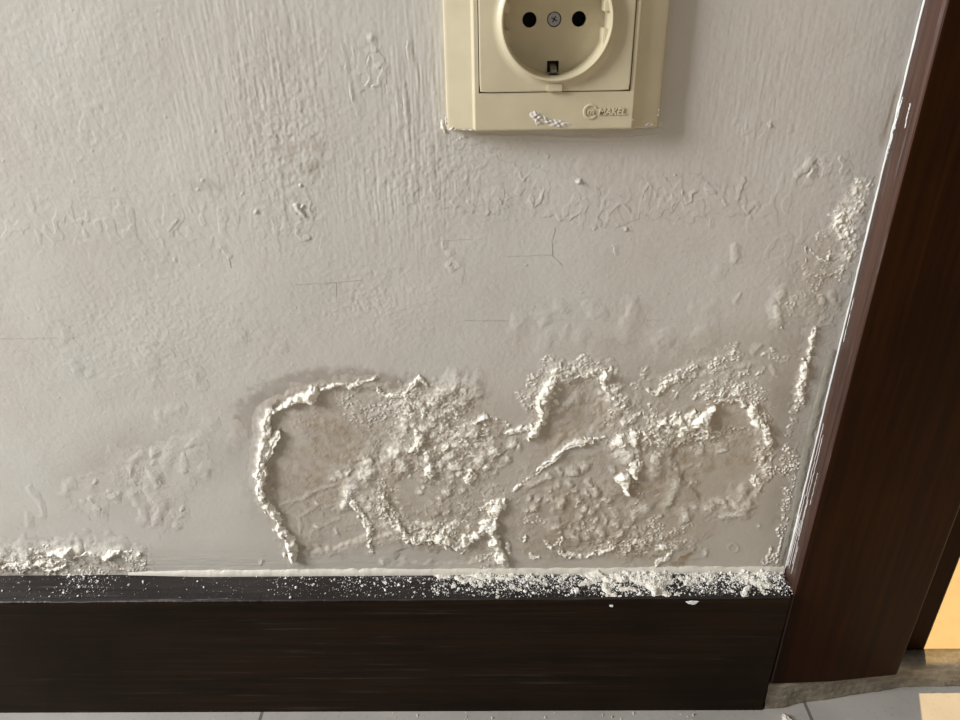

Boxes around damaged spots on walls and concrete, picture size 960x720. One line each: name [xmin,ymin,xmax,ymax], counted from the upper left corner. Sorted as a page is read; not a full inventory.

peeling [246,341,792,570]
efflorescence [757,176,875,567]